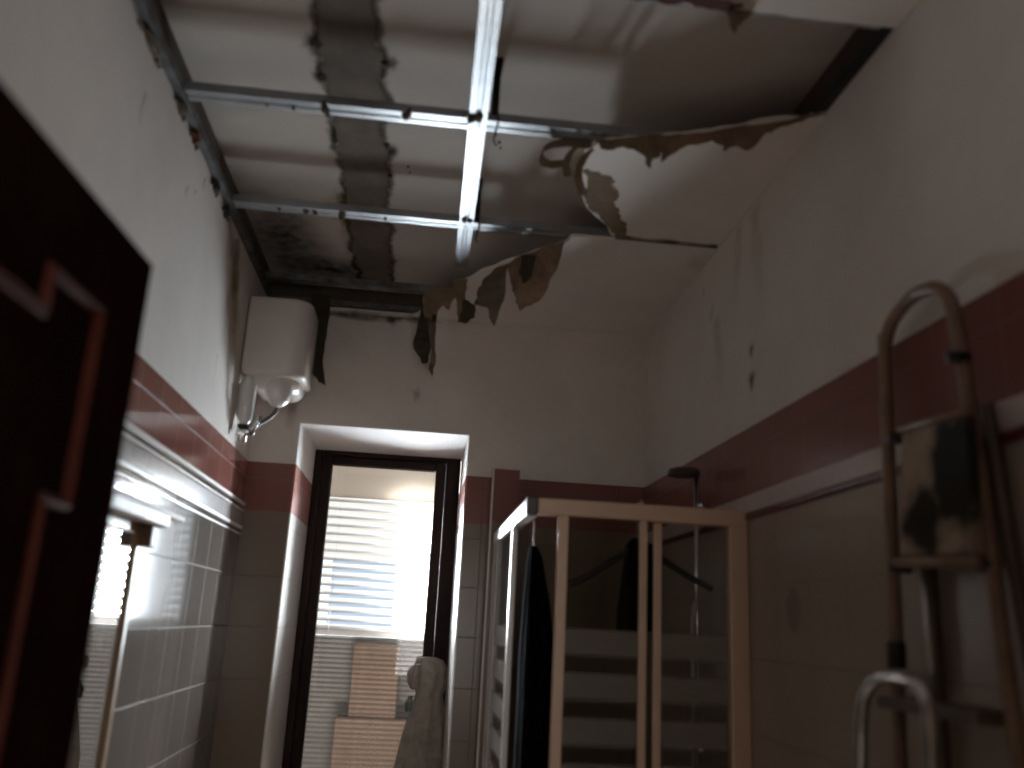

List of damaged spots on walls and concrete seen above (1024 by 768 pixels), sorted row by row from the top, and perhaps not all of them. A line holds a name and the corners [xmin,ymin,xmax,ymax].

flaking render [137,19,162,69]
peeling [307,0,395,102]
flaking render [174,96,200,151]
peeling [328,115,396,208]
flaking render [210,177,230,222]
peeling [345,218,396,282]